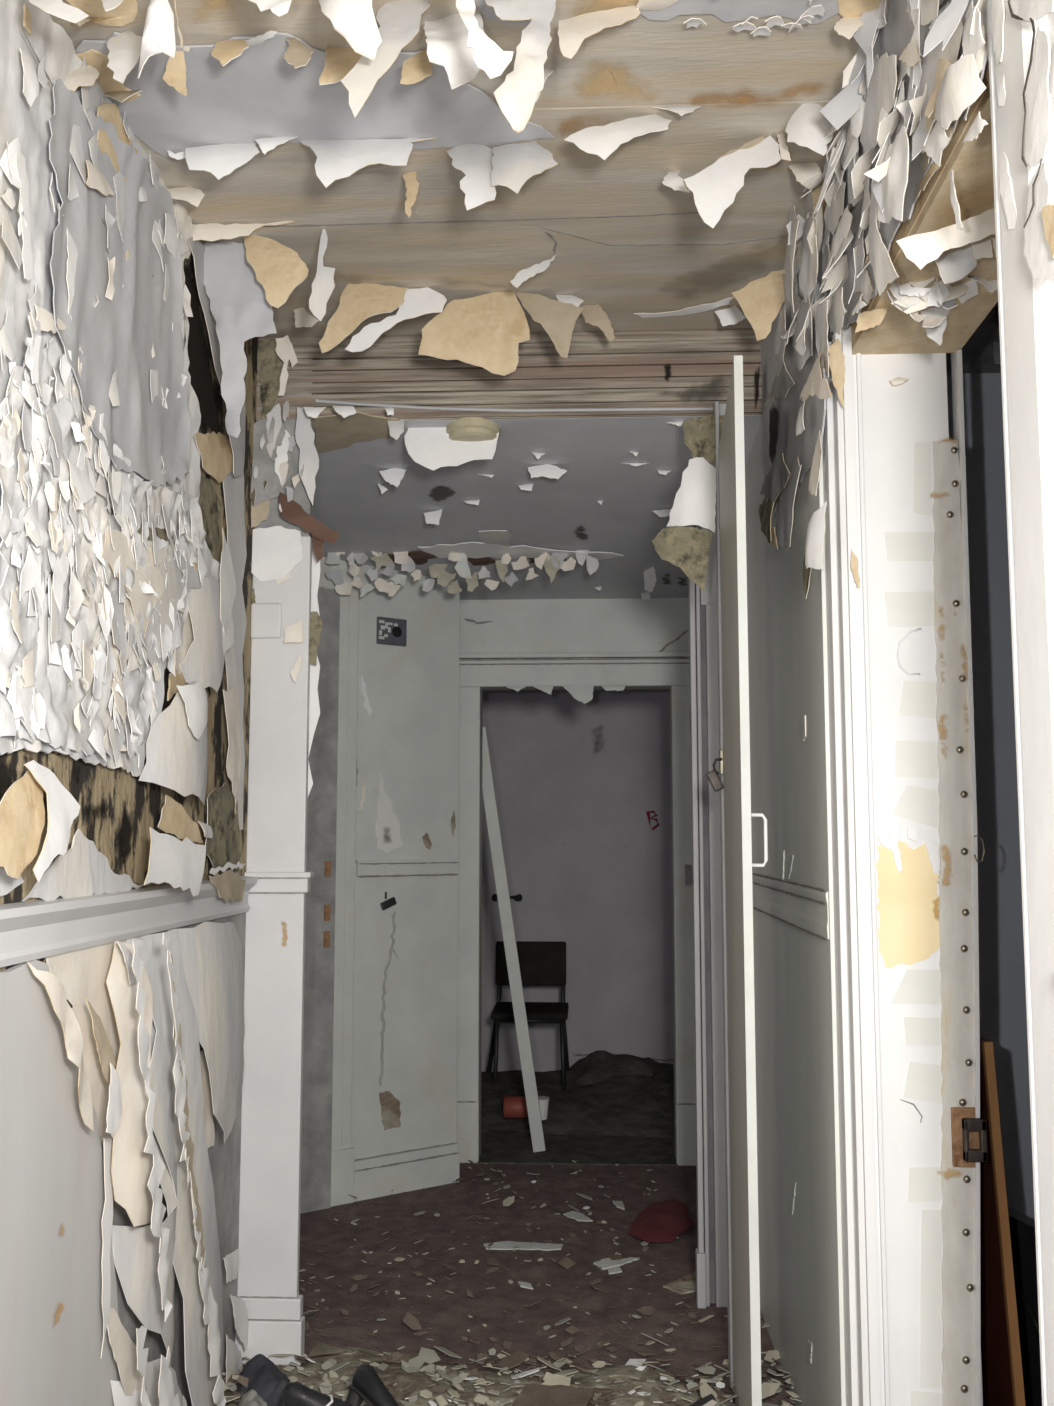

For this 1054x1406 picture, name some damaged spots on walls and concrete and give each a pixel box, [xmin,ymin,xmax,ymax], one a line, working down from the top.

peeling [0,0,1054,902]
spalling [876,821,940,968]
crack [379,911,398,1086]
peeling [27,921,250,1406]
spalling [379,1091,401,1131]
peeling [268,1160,738,1406]
peeling [761,1350,802,1406]